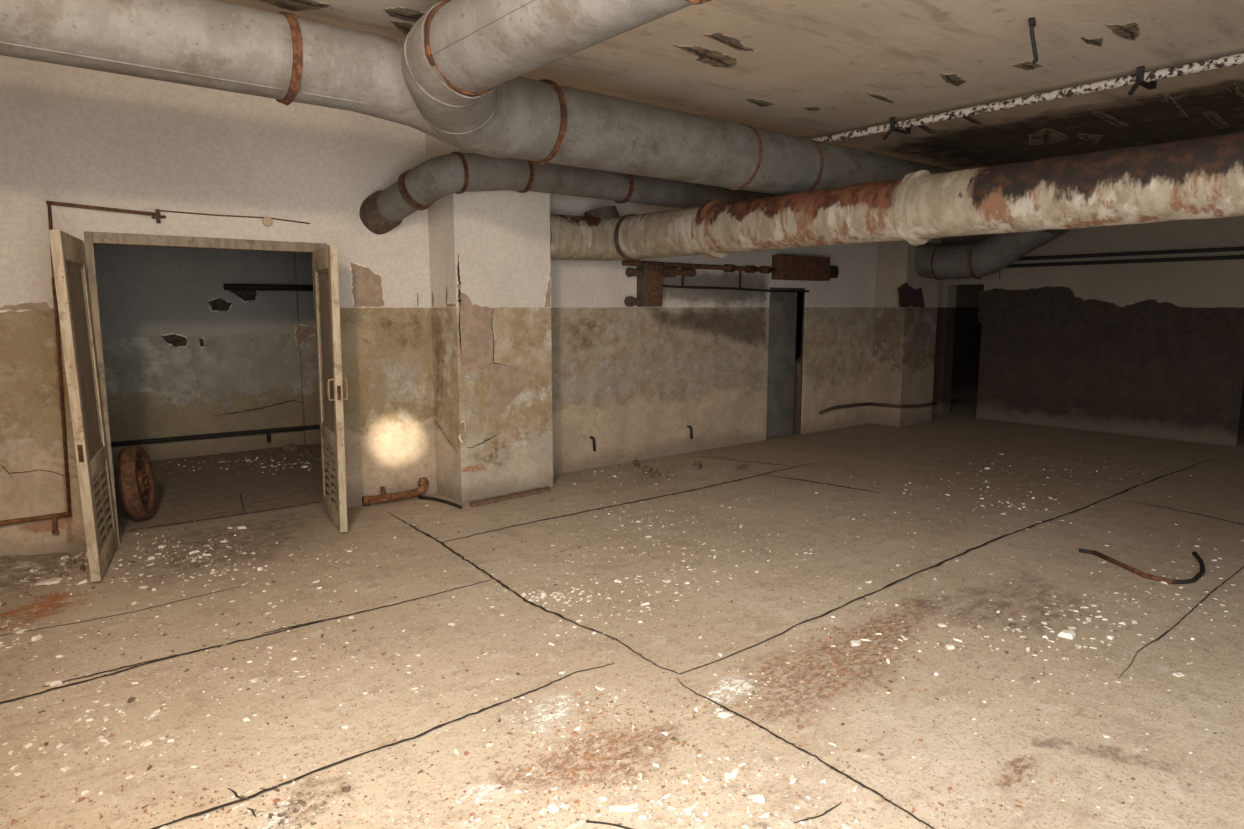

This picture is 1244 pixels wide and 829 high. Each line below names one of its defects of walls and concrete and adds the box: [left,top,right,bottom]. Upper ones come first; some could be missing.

spalling [259,0,330,11]
spalling [1078,21,1142,46]
spalling [673,33,757,68]
spalling [1011,61,1045,71]
spalling [939,73,967,87]
peeling [350,262,385,308]
peeling [0,301,51,313]
peeling [447,293,536,423]
crack [2,465,78,479]
crack [1119,566,1244,678]